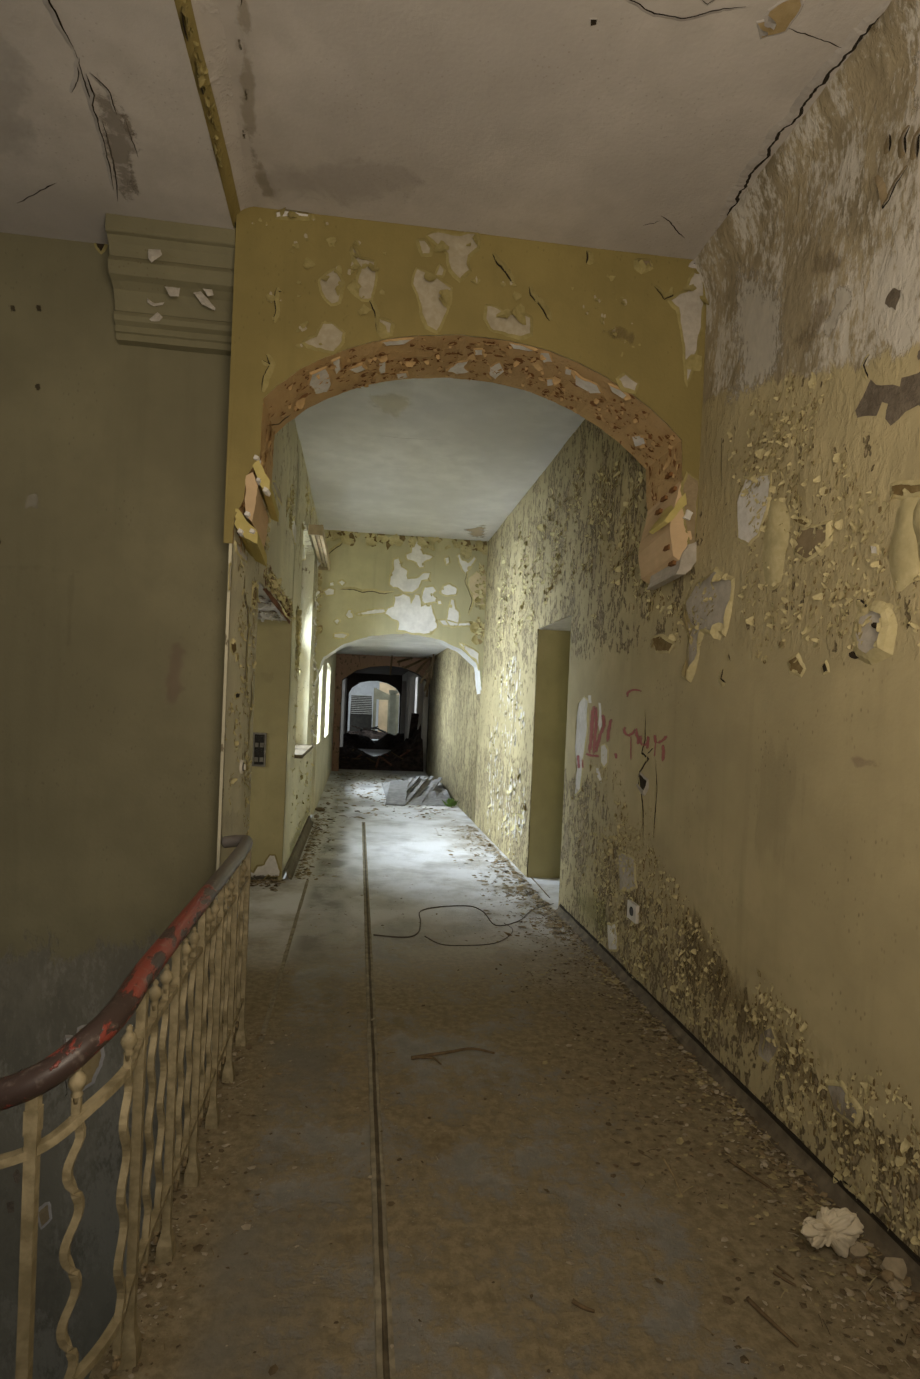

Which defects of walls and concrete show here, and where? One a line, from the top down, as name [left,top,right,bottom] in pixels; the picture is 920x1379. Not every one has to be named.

peeling [756,0,804,39]